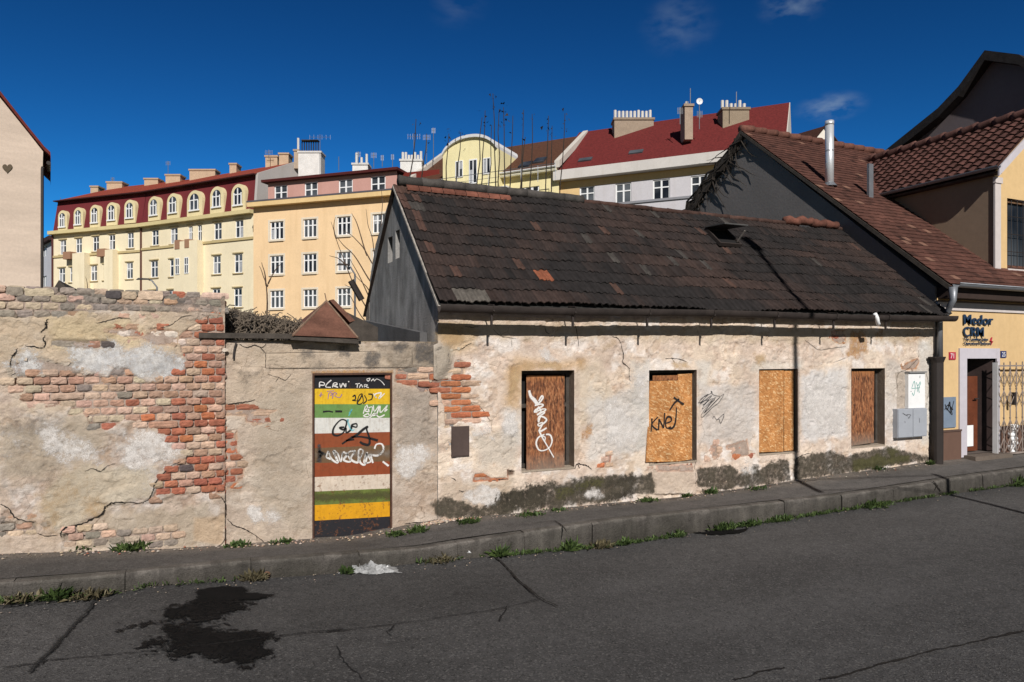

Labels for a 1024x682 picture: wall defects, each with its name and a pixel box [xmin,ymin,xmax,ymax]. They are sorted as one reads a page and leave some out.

crack [10,319,48,367]
spalling [0,285,284,504]
spalling [385,361,490,428]
crack [0,456,187,538]
crack [219,497,264,546]
water stain [432,472,655,519]
water stain [697,447,930,490]
water stain [103,598,282,670]
crack [0,557,558,679]